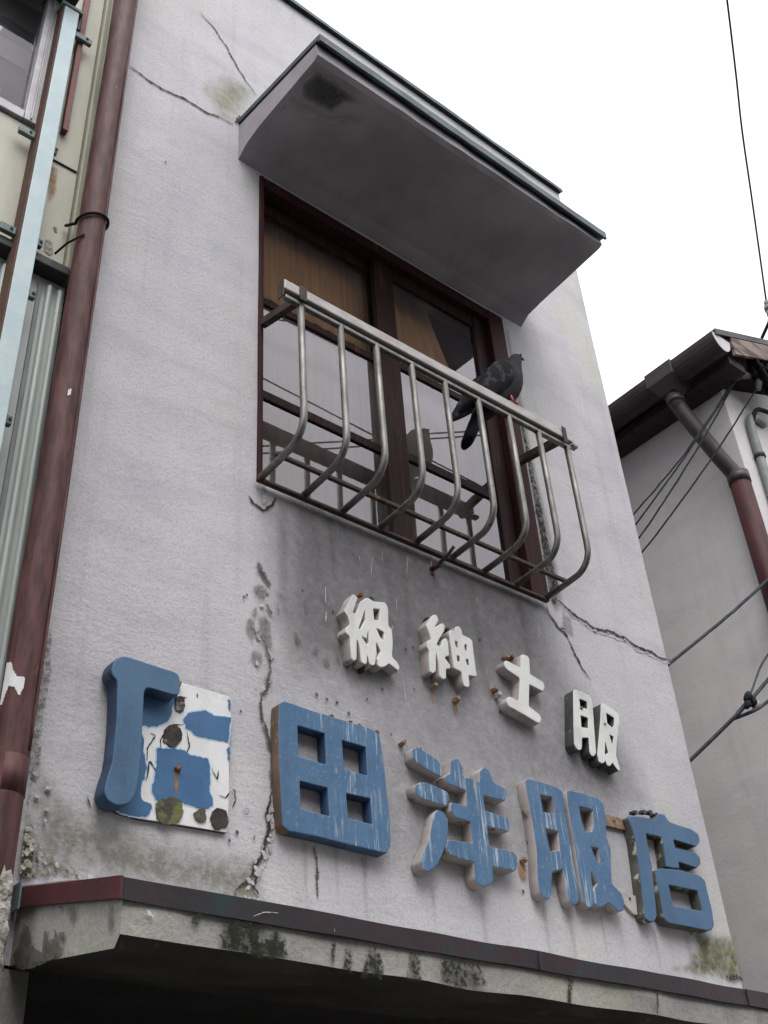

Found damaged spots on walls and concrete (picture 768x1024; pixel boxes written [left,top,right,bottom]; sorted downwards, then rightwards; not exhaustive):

crack [203,16,254,91]
crack [132,68,233,124]
leakage [278,76,365,114]
crack [547,599,674,679]
crack [234,561,276,896]
leakage [219,920,288,959]
leakage [331,943,384,980]
leakage [407,951,422,981]
leakage [442,959,486,988]